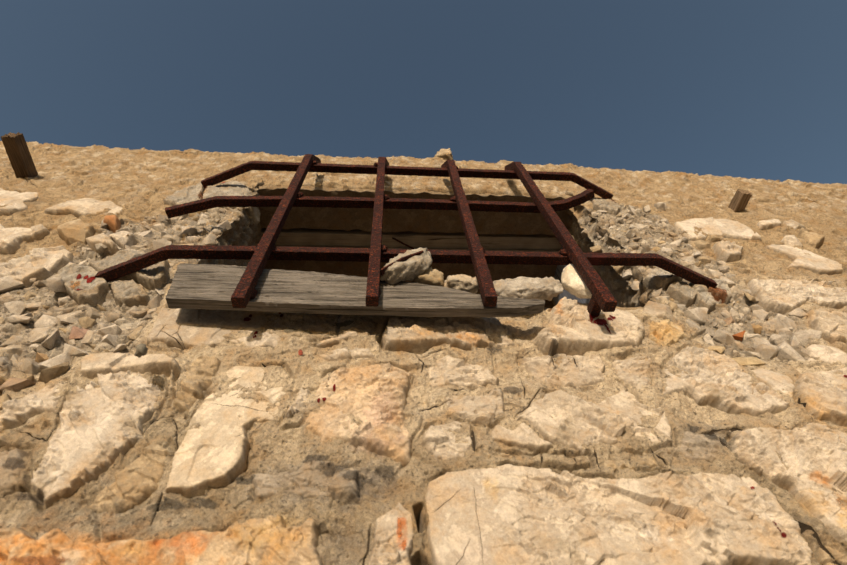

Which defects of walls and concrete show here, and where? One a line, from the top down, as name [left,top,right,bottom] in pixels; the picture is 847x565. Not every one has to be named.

corrosion [708,286,727,304]